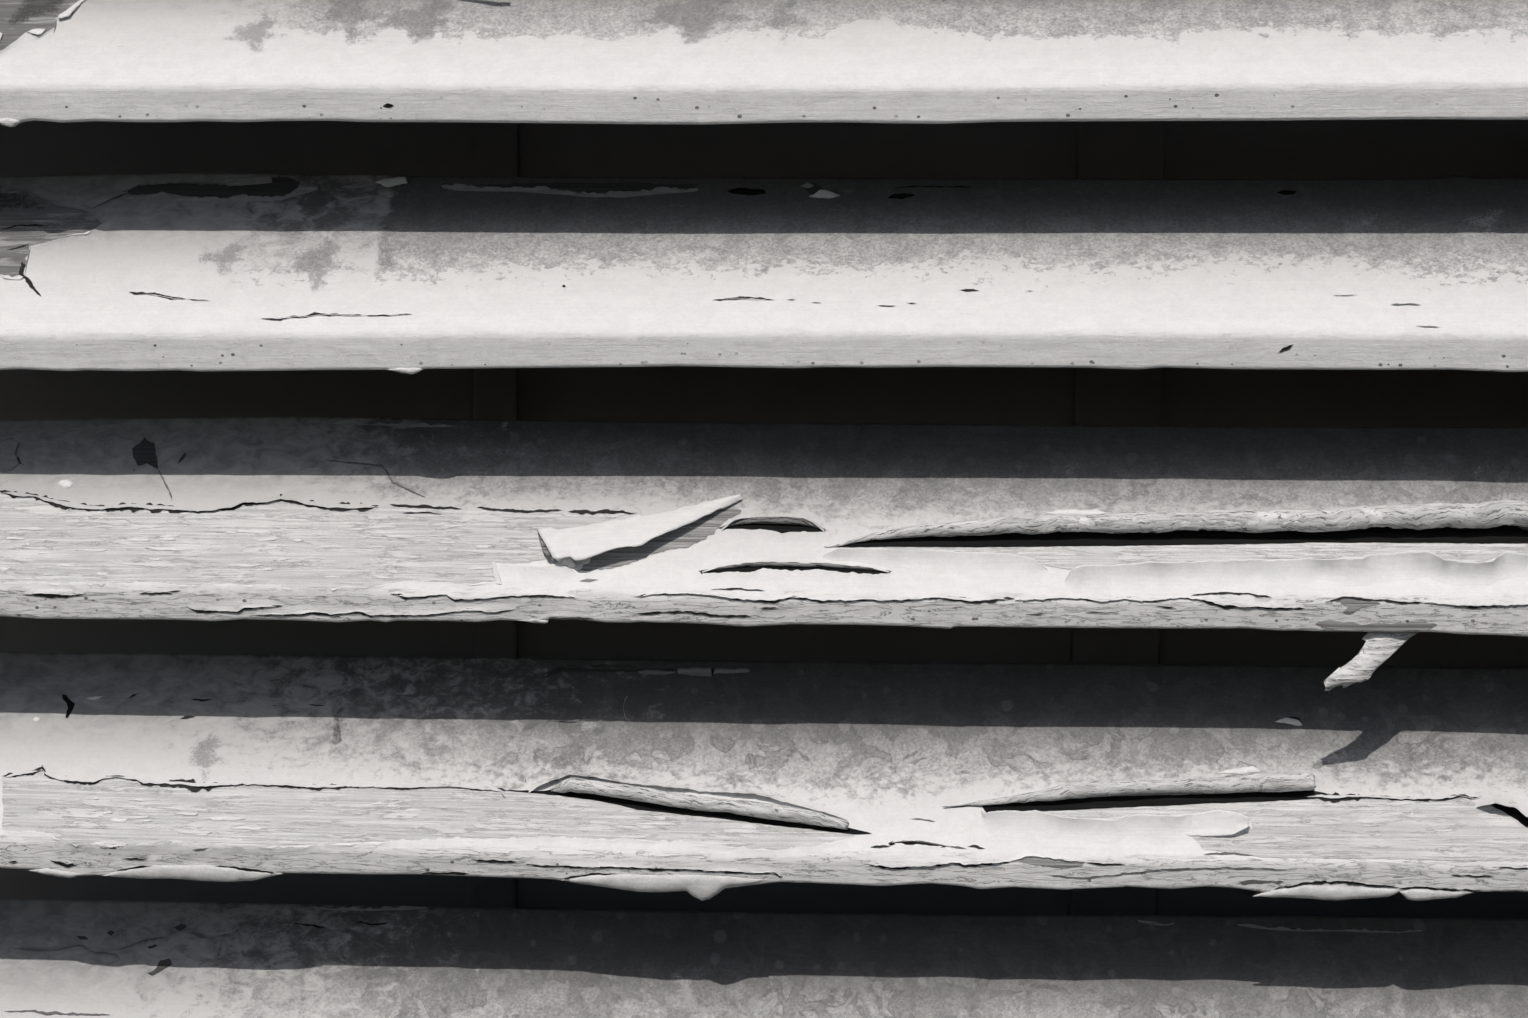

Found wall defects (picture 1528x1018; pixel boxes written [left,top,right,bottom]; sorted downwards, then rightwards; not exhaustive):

peeling [0,0,88,58]
peeling [0,424,128,472]
crack [0,458,633,515]
peeling [0,437,890,596]
crack [3,765,526,798]
peeling [2,768,855,858]
peeling [872,818,983,857]
peeling [1475,787,1528,827]